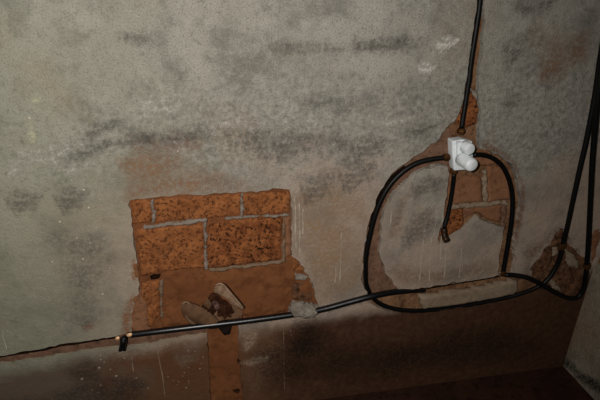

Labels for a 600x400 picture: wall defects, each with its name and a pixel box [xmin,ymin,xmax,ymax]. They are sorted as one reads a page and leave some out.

damp [433,36,464,53]
spalling [129,188,318,331]
spalling [438,123,518,272]
spalling [531,228,600,296]